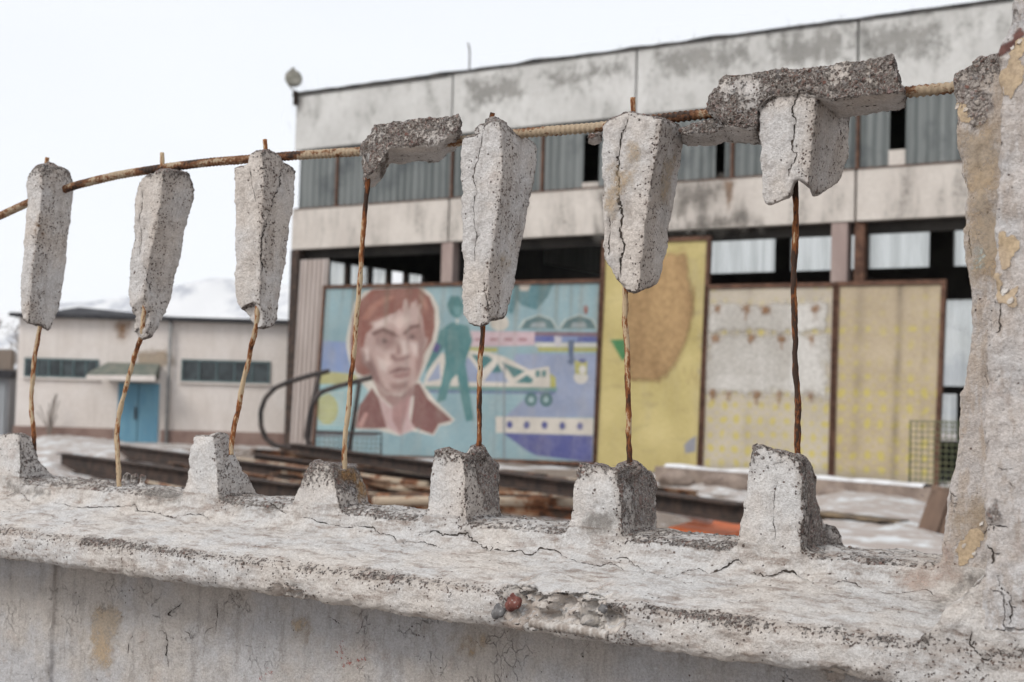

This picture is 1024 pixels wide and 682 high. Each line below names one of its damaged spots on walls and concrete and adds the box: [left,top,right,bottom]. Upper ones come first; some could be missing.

spalling [0,199,28,220]
spalling [62,154,250,193]
spalling [276,147,360,161]
crack [608,119,628,274]
spalling [652,109,713,123]
crack [788,92,814,176]
peeling [904,28,1024,308]
peeling [705,301,830,399]
crack [55,502,209,519]
crack [271,504,798,578]
spalling [491,574,626,641]
crack [984,524,1015,623]